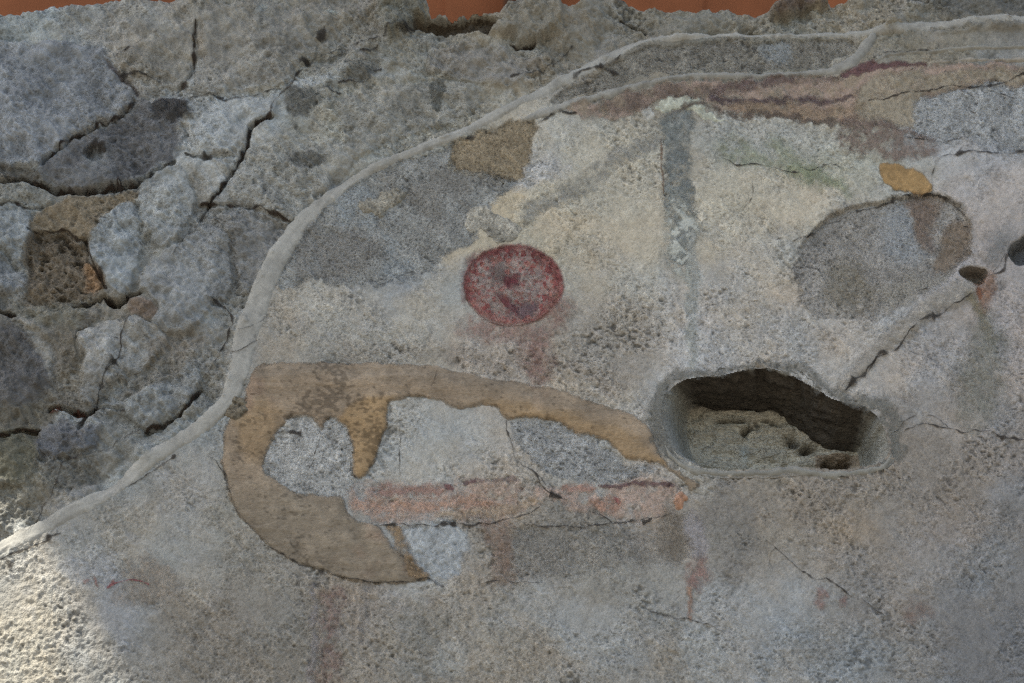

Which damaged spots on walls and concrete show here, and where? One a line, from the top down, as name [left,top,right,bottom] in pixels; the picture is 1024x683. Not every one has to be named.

crack [112,30,160,82]
crack [868,72,1024,113]
crack [83,139,106,154]
flaking render [792,193,988,320]
crack [97,314,130,405]
crack [210,298,253,370]
crack [845,253,1009,391]
crack [379,420,669,528]
crack [766,540,883,614]